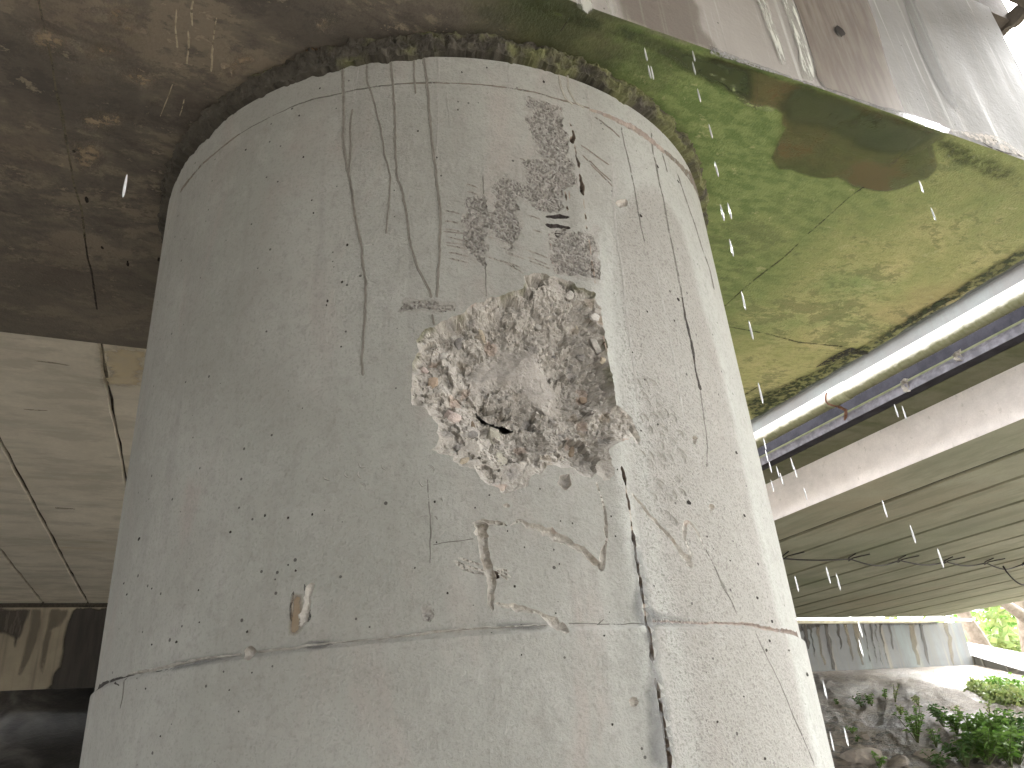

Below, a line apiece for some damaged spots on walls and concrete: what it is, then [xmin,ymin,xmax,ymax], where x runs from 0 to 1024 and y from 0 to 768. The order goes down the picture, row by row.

damp [532,0,599,28]
damp [621,0,949,191]
crack [180,82,700,283]
spalling [545,214,571,237]
crack [725,188,862,347]
spalling [411,273,640,508]
damp [0,607,107,689]
peeling [299,583,315,627]
crack [569,466,814,768]
damp [798,619,842,670]
damp [863,622,937,663]